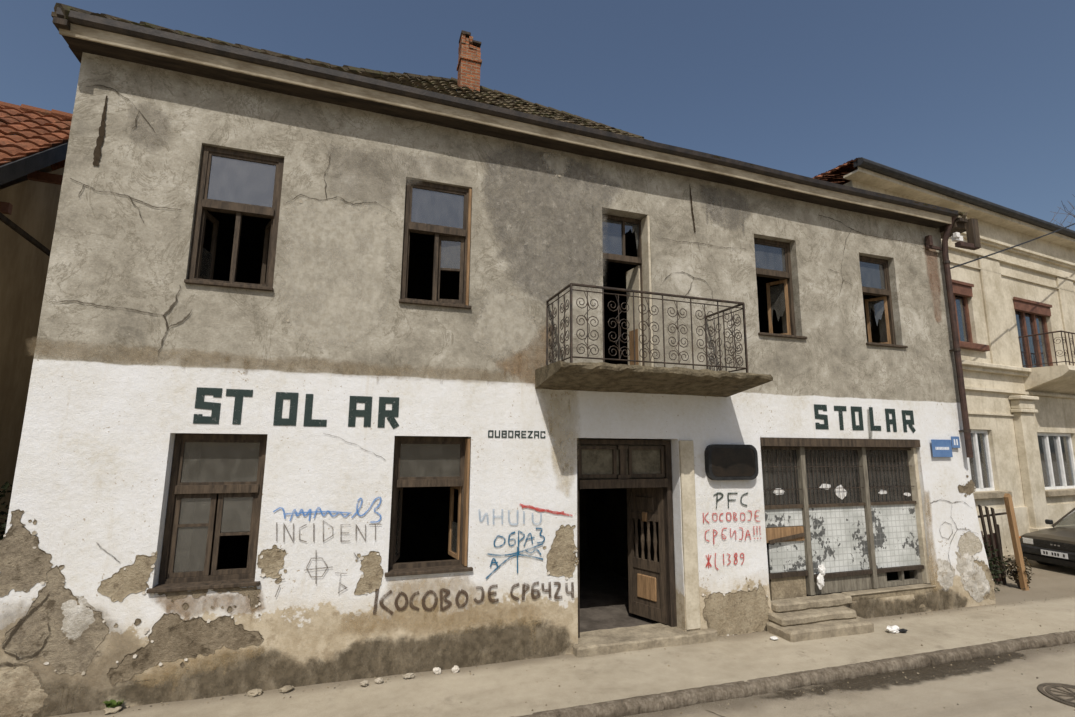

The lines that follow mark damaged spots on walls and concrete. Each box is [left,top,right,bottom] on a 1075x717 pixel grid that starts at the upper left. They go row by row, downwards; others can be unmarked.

crack [70,85,181,223]
crack [286,154,396,214]
crack [53,286,191,356]
peeling [958,475,976,497]
peeling [0,509,118,675]
peeling [97,545,287,686]
peeling [354,551,383,595]
peeling [543,524,579,580]
peeling [702,577,770,636]
peeling [958,527,995,600]
damp [20,620,570,717]